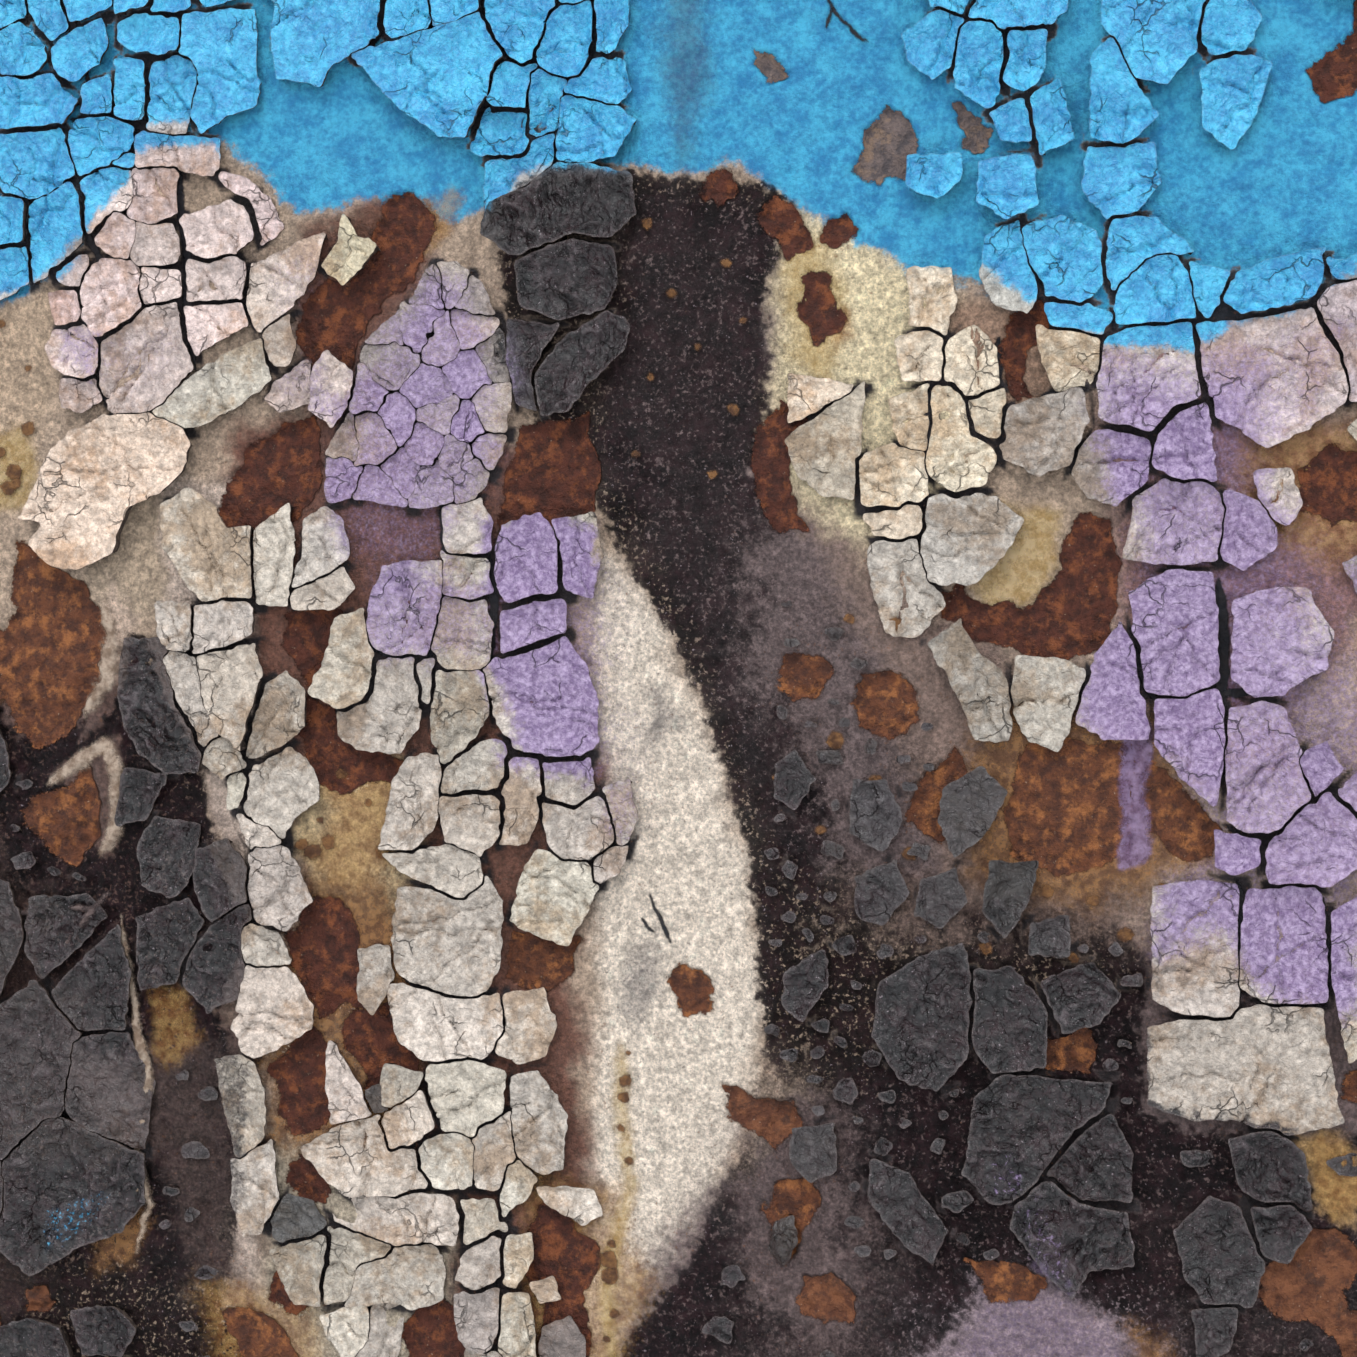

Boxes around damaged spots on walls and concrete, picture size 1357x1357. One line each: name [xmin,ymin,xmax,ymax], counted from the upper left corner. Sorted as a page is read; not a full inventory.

peeling [351,12,504,138]
corrosion [1306,0,1357,103]
peeling [321,214,381,285]
corrosion [296,192,438,370]
peeling [18,338,272,570]
corrosion [218,415,323,537]
corrosion [0,540,118,749]
crack [0,0,639,1357]
corrosion [19,738,123,867]
crack [641,894,671,943]
peeling [365,1084,389,1113]
peeling [529,1276,561,1304]